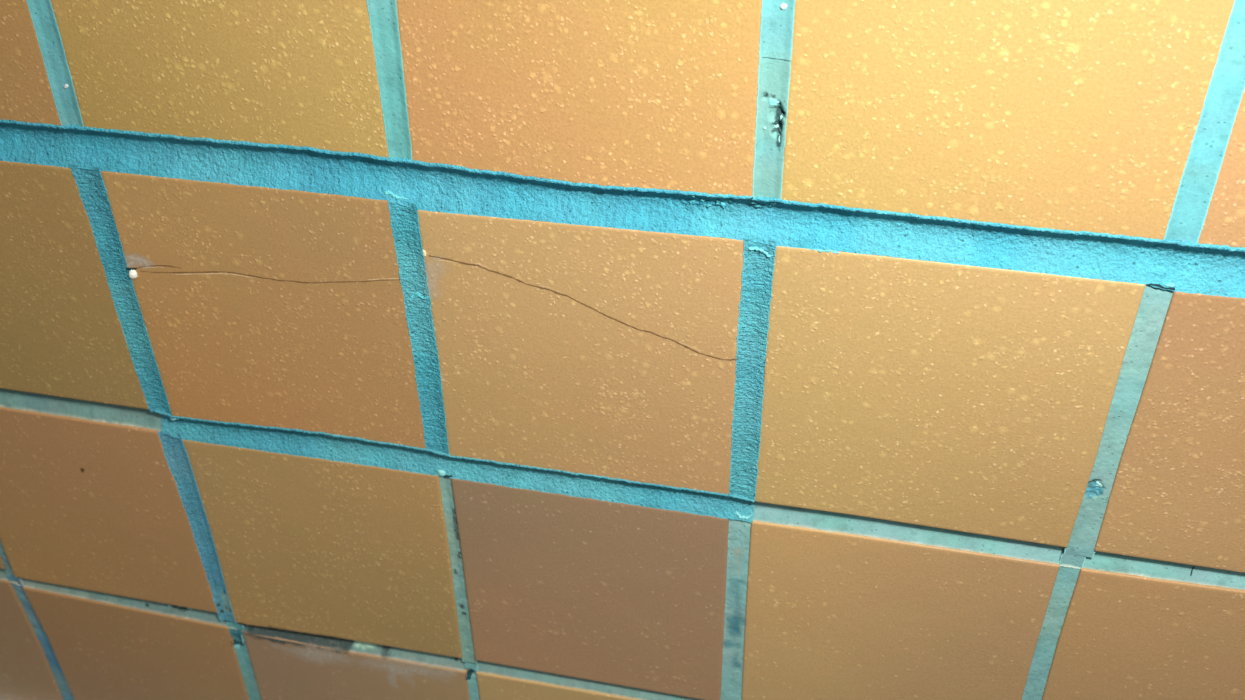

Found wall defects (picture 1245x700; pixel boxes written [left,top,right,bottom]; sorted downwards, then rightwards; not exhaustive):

crack [138,265,399,284]
crack [429,255,737,361]